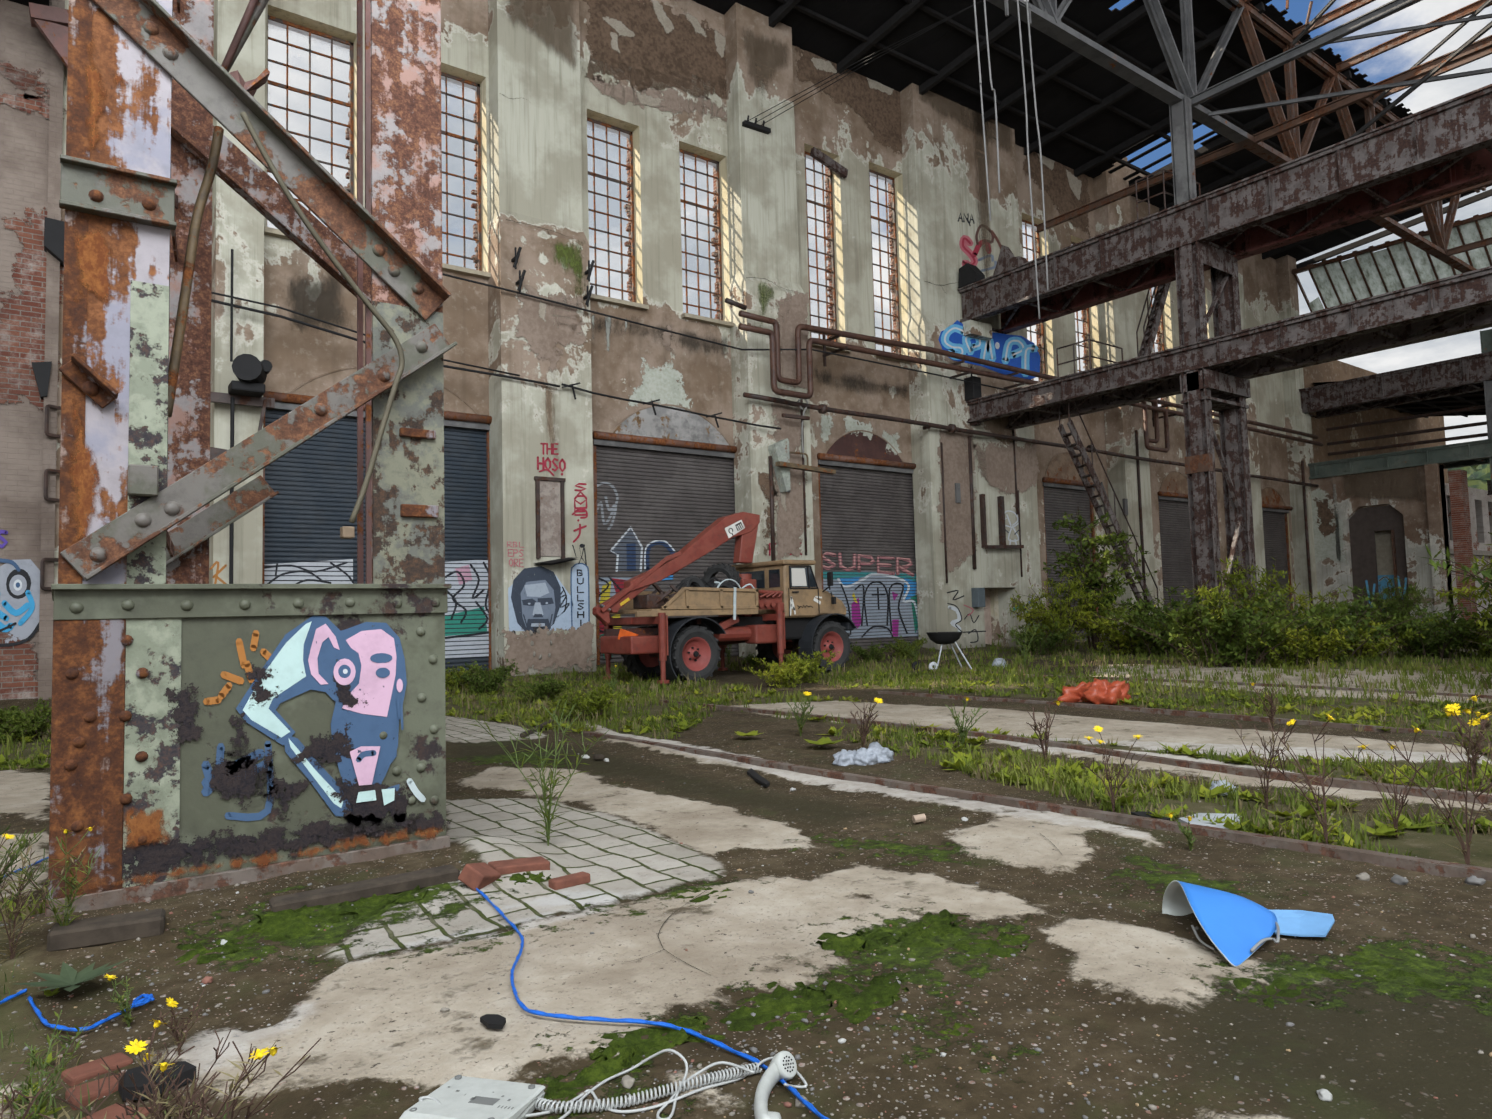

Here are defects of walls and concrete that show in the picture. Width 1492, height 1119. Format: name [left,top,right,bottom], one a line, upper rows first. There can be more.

flaking render [0,61,67,119]
corrosion [66,0,92,160]
peeling [583,0,727,122]
flaking render [0,207,65,411]
corrosion [58,209,111,584]
peeling [515,285,587,372]
peeling [122,663,450,879]